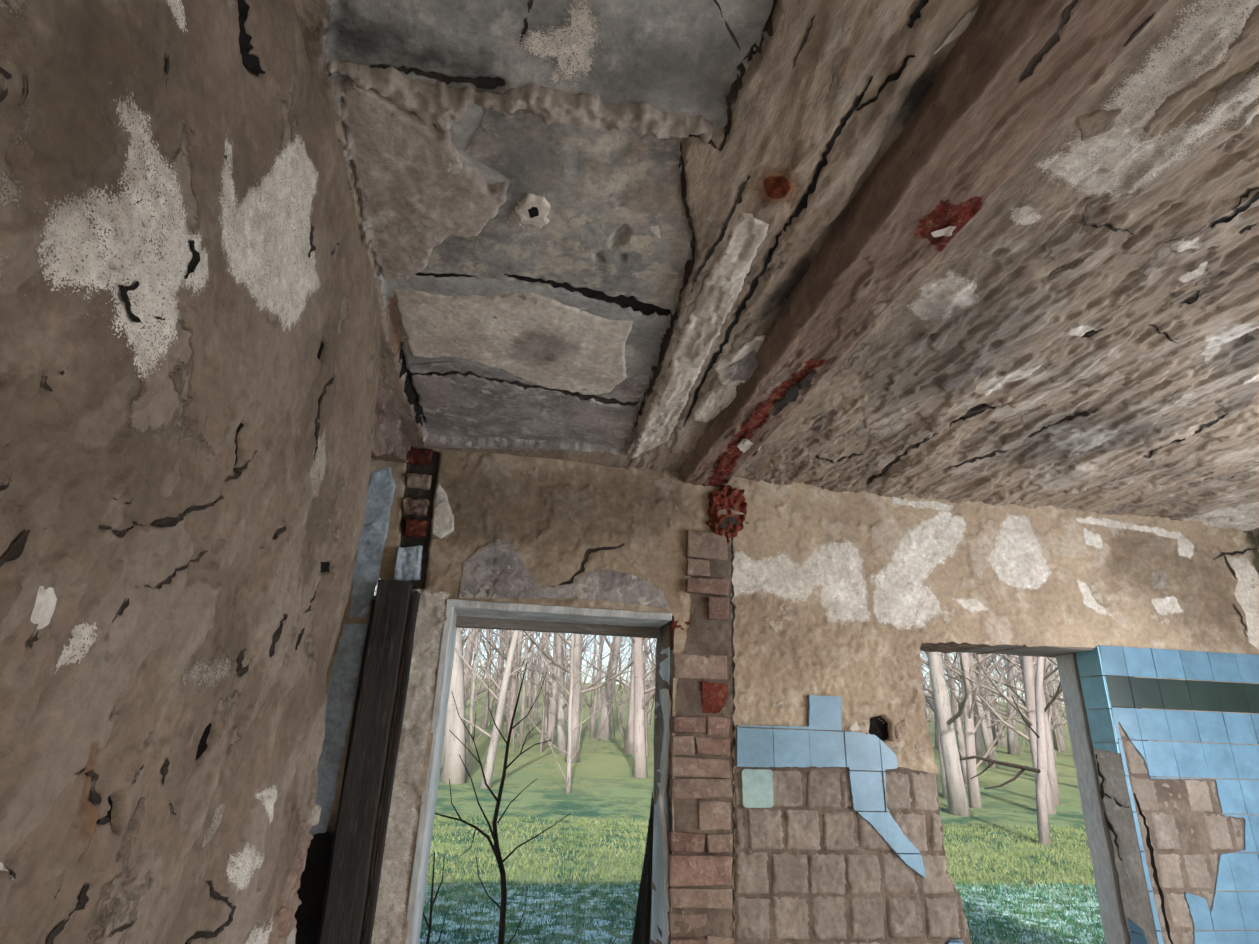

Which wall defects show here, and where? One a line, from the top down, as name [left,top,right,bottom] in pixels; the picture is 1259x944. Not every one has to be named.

spalling [1094,722,1244,944]